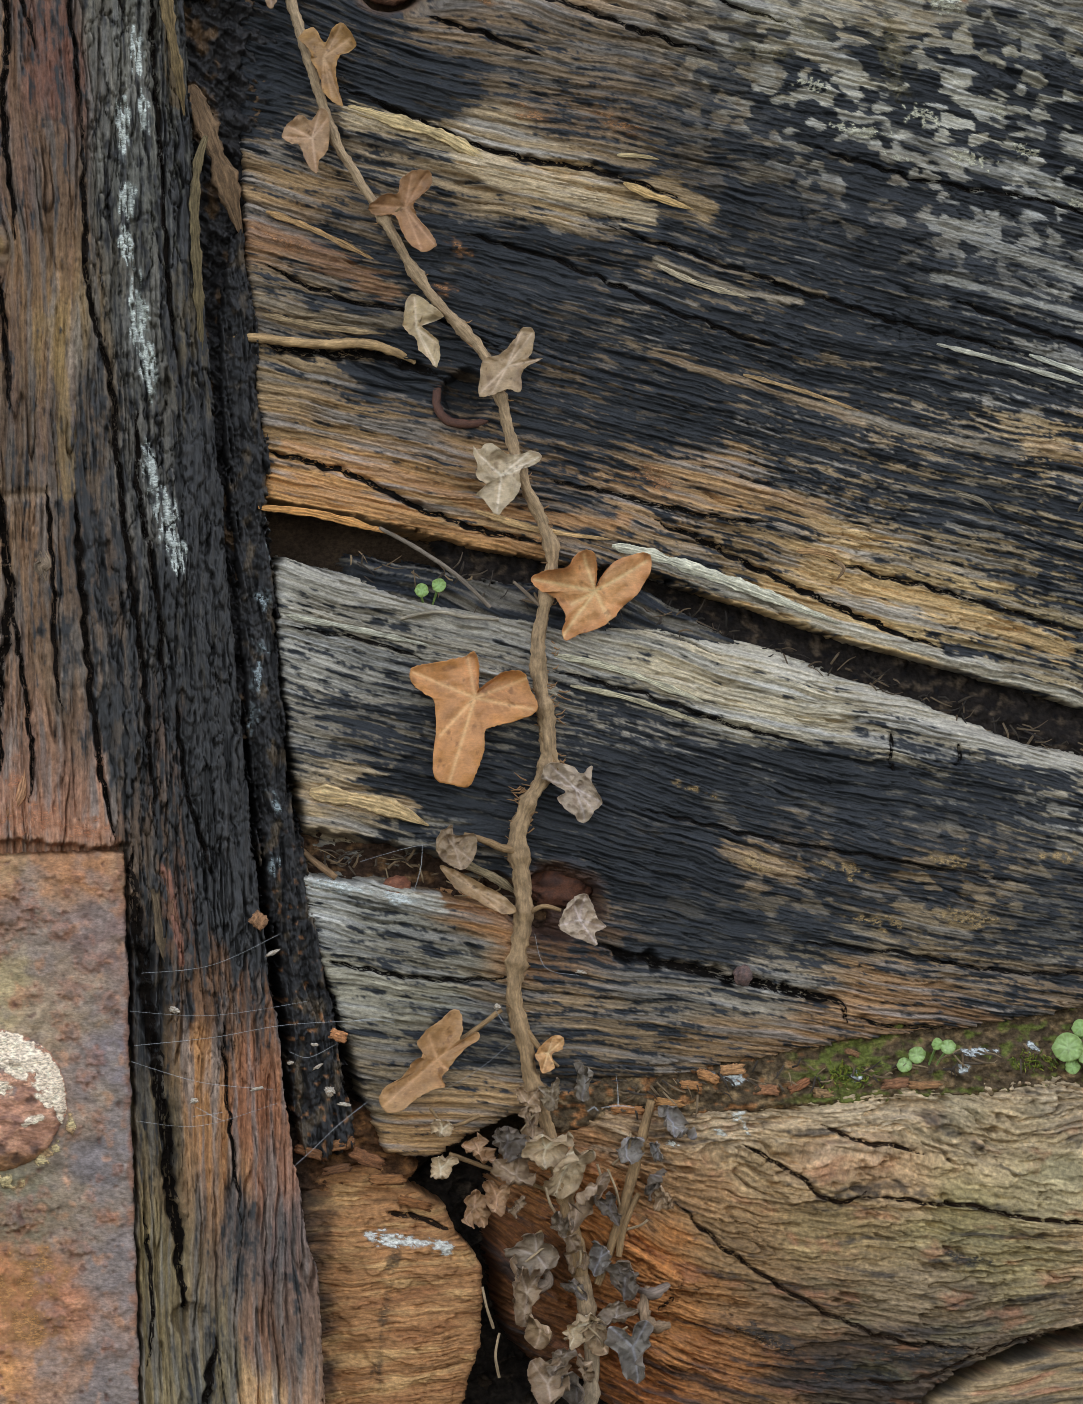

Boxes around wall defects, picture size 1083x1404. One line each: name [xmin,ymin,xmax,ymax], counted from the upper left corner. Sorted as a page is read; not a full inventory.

crack [0,0,215,1366]
crack [821,1124,924,1155]
crack [745,1145,1083,1225]
crack [677,1204,1083,1387]
crack [202,1337,218,1404]